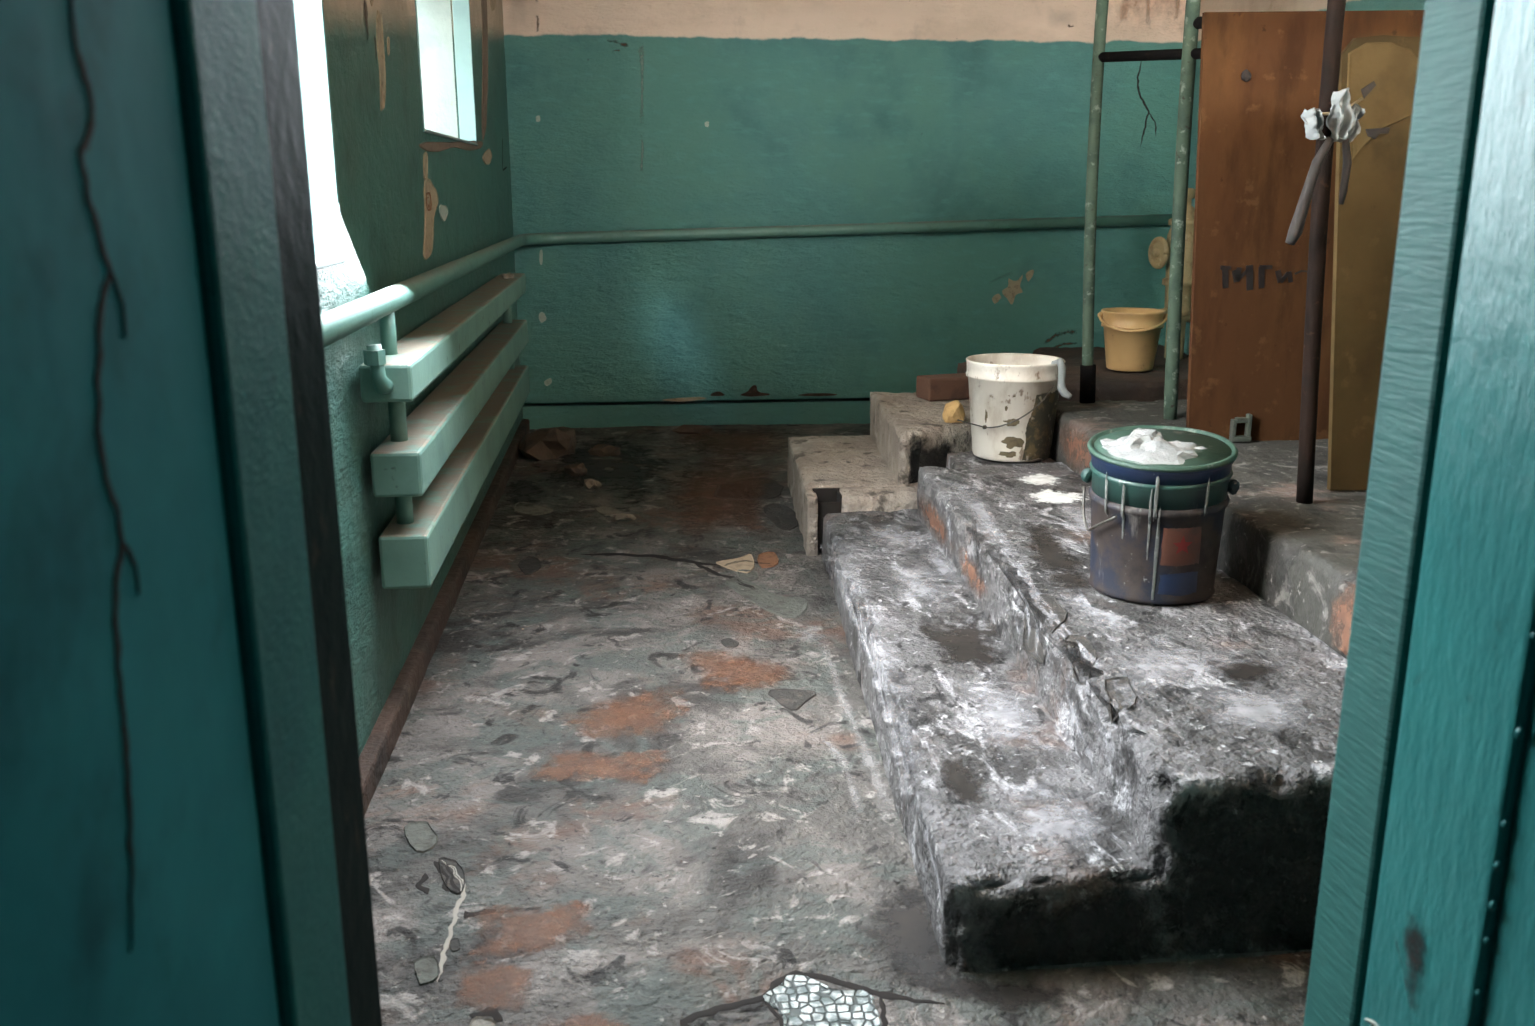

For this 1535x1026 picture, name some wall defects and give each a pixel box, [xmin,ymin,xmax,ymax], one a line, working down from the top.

peeling [419,0,496,260]
peeling [992,270,1034,304]
crack [69,0,140,952]
damp [903,558,949,596]
damp [866,789,1330,1011]